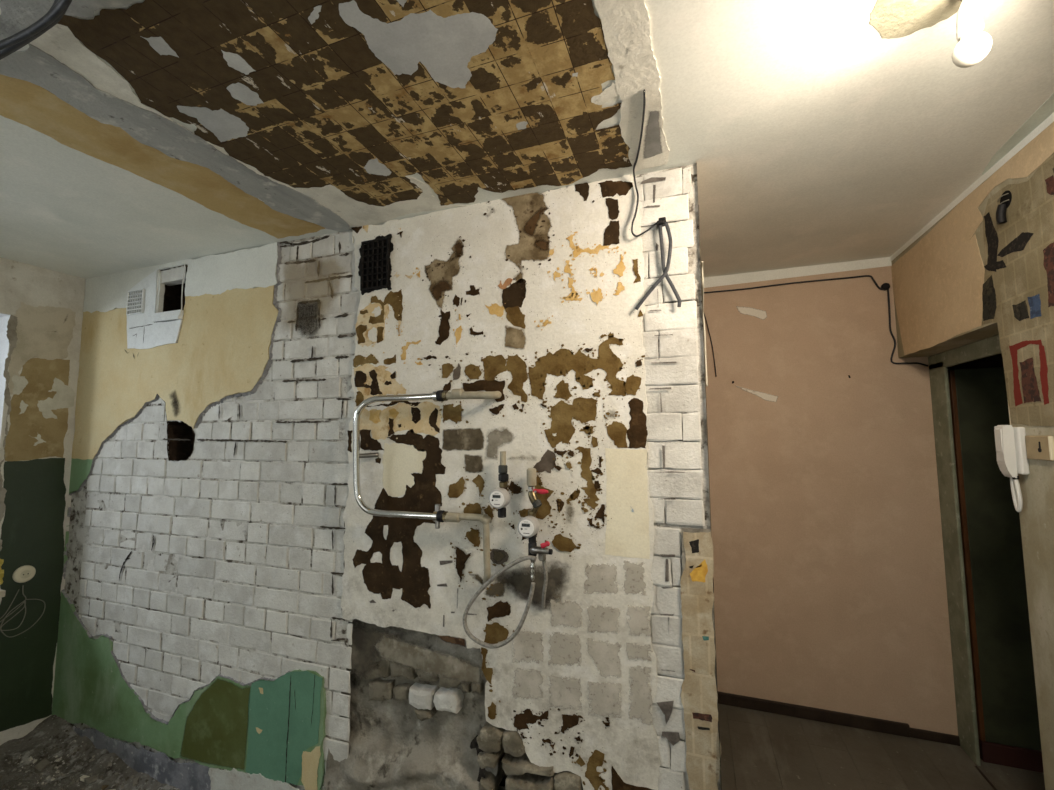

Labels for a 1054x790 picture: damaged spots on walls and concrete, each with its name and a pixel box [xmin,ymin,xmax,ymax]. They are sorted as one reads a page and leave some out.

spalling [221,50,263,106]
spalling [339,0,498,88]
peeling [869,0,962,39]
spalling [177,106,249,142]
peeling [505,306,526,349]
peeling [0,302,76,521]
flaking render [61,225,440,790]
peeling [448,474,494,523]
peeling [456,529,511,644]
peeling [552,534,577,552]
flaking render [556,167,705,790]
spalling [476,702,585,790]